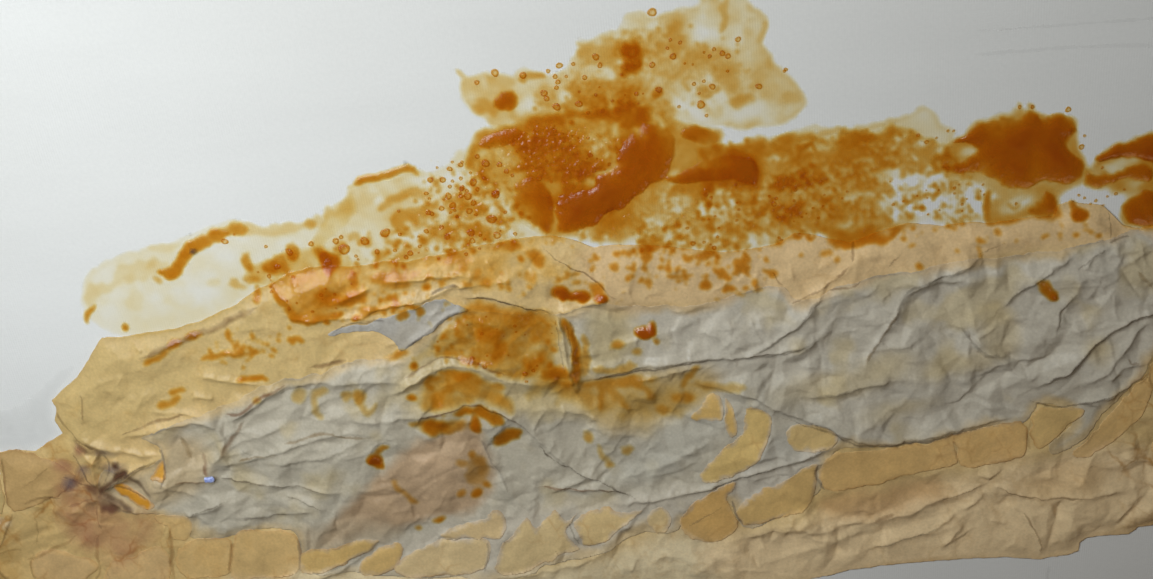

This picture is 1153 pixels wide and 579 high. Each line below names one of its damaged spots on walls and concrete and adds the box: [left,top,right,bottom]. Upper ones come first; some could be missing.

rust [553,288,605,302]
rust [636,324,655,339]